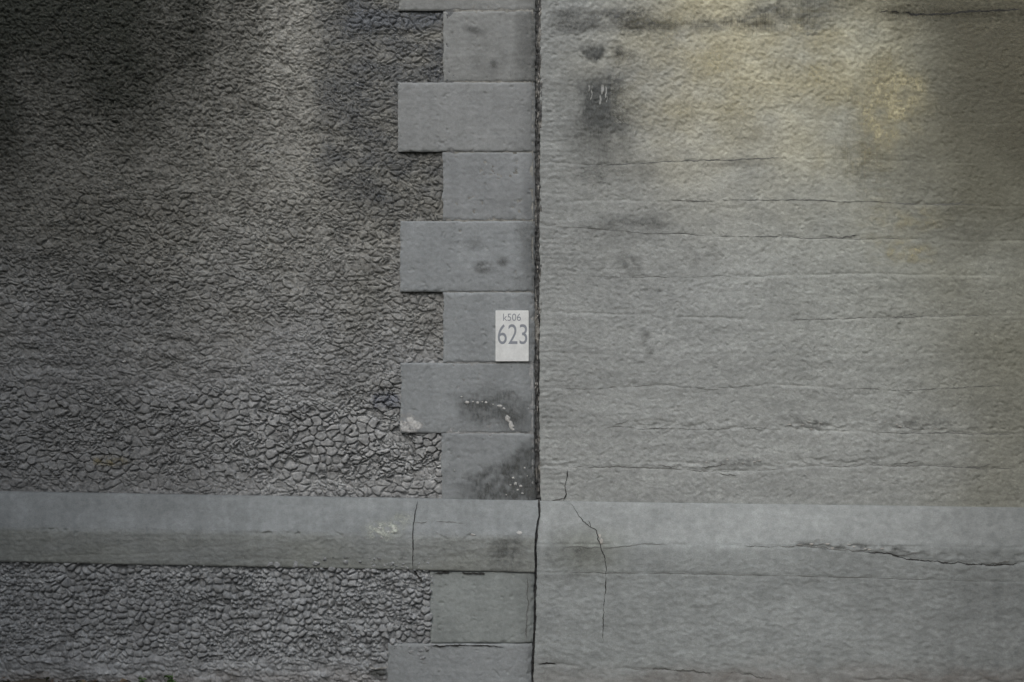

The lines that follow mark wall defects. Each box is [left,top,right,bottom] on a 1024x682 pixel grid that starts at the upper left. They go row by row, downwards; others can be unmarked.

damp [584,47,623,61]
damp [582,80,623,145]
crack [412,502,485,582]
crack [525,464,784,638]
crack [750,543,1017,582]